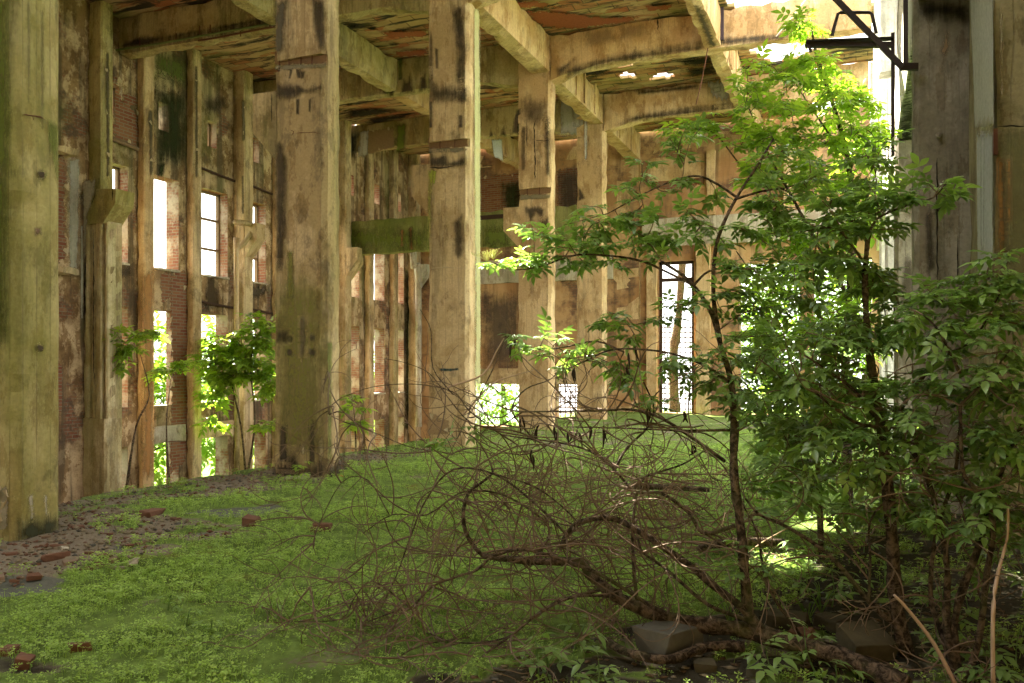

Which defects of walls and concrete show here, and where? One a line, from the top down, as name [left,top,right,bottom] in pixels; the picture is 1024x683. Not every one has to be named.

water stain [155,54,186,86]
peeling [105,23,275,176]
peeling [58,155,69,264]